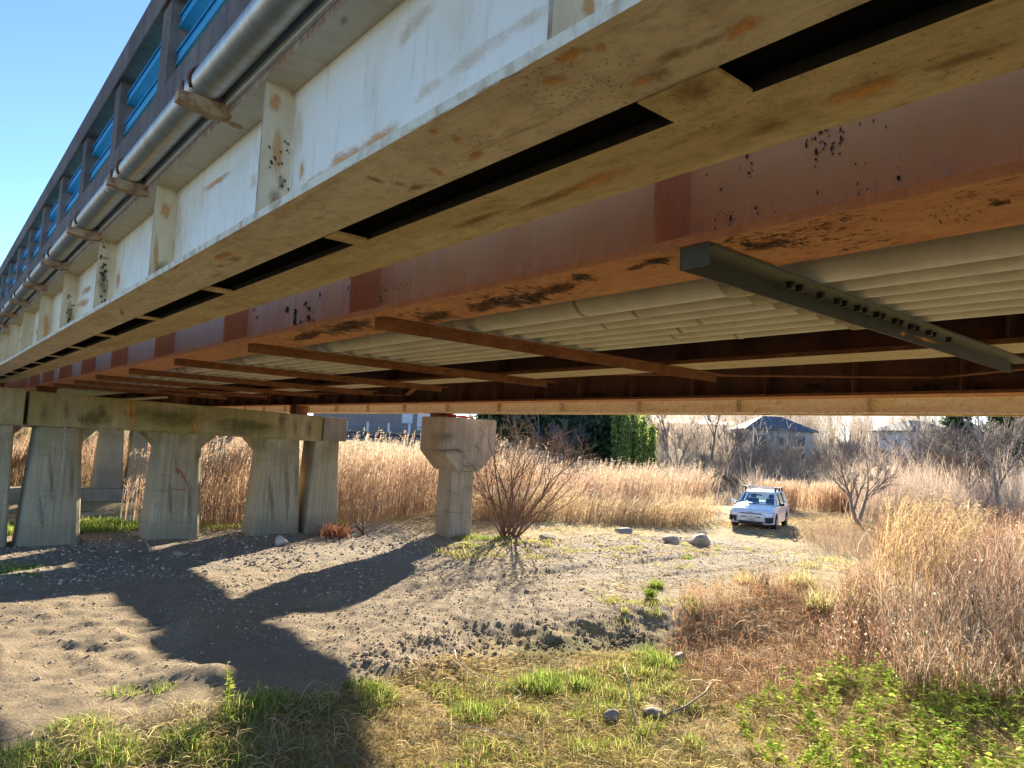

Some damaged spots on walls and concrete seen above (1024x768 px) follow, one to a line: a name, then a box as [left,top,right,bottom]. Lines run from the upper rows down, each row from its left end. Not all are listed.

rust [740,214,882,251]
rust [629,257,670,271]
rust [412,274,597,324]